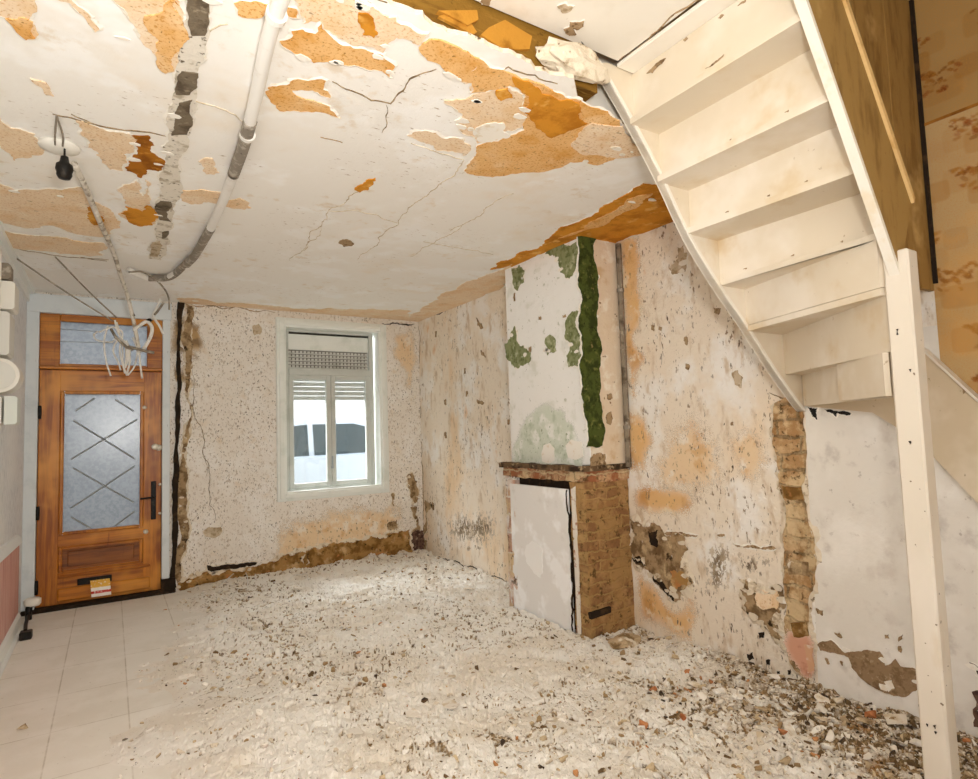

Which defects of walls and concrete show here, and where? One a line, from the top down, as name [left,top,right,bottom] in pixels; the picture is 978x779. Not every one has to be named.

peeling [112,0,190,84]
peeling [264,76,341,119]
crack [332,69,436,132]
peeling [279,0,641,177]
peeling [0,107,251,257]
crack [291,143,464,261]
crack [410,193,514,257]
crack [192,370,216,518]
peeling [171,182,673,591]
damp [511,402,584,466]
flaking render [629,514,695,604]
peeling [739,397,917,698]